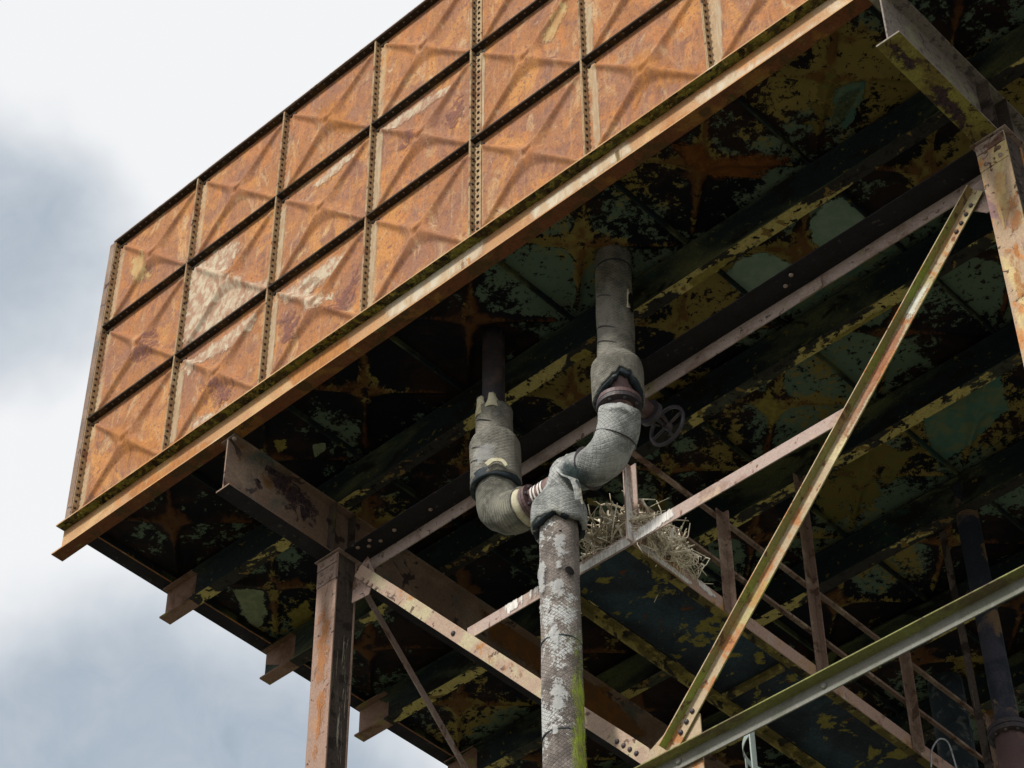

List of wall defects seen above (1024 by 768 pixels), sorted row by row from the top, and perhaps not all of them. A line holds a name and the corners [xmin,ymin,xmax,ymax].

peeling [181,240,267,375]
peeling [280,252,346,309]
peeling [688,252,792,293]
peeling [904,282,930,319]
rust [287,337,348,385]
rust [844,326,904,436]
rust [129,441,210,497]
peeling [813,376,1010,523]
peeling [537,534,571,659]
rust [484,611,541,673]
rust [312,603,329,758]
rust [583,677,646,737]